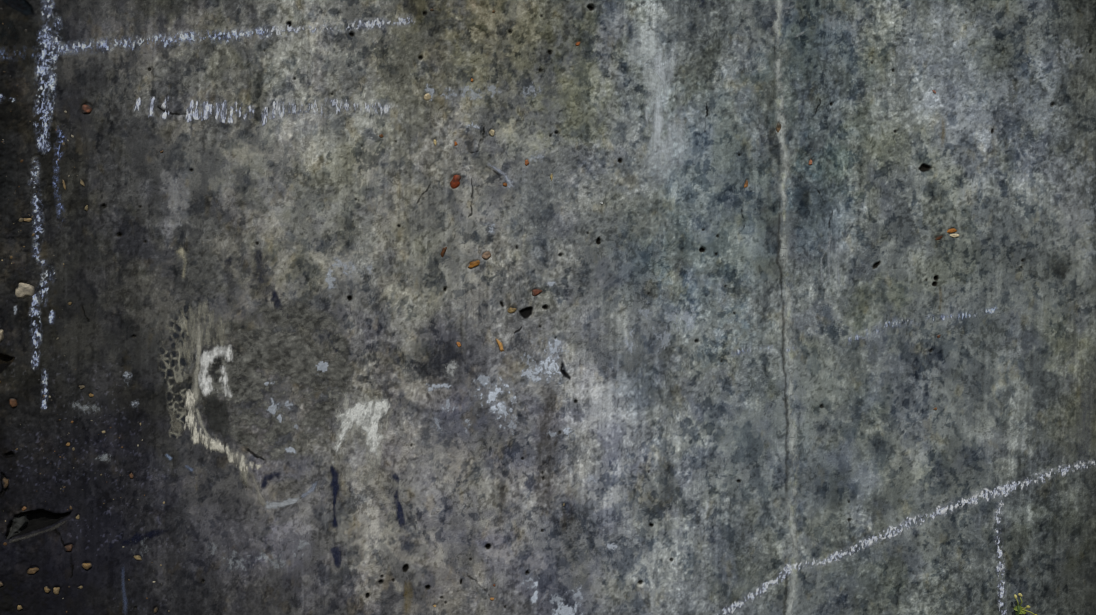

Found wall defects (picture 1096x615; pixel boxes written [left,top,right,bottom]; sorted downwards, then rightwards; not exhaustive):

spalling [163,301,390,509]
hole [6,510,71,543]